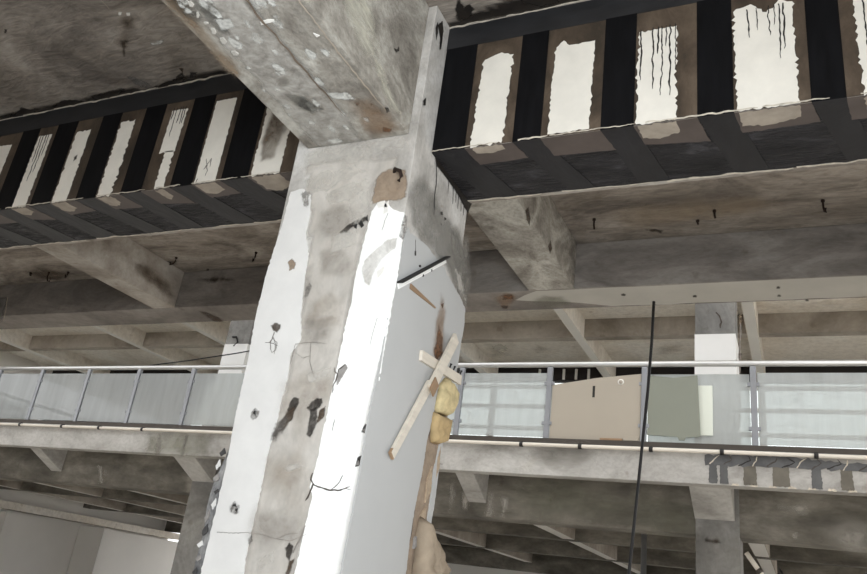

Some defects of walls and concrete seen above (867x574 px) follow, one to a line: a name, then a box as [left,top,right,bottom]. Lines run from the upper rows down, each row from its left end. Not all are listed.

flaking render [165,0,359,146]
flaking render [298,0,395,113]
leakage [436,0,579,49]
leakage [639,23,677,95]
leakage [746,3,786,58]
flaking render [244,158,407,574]
crack [305,473,351,501]